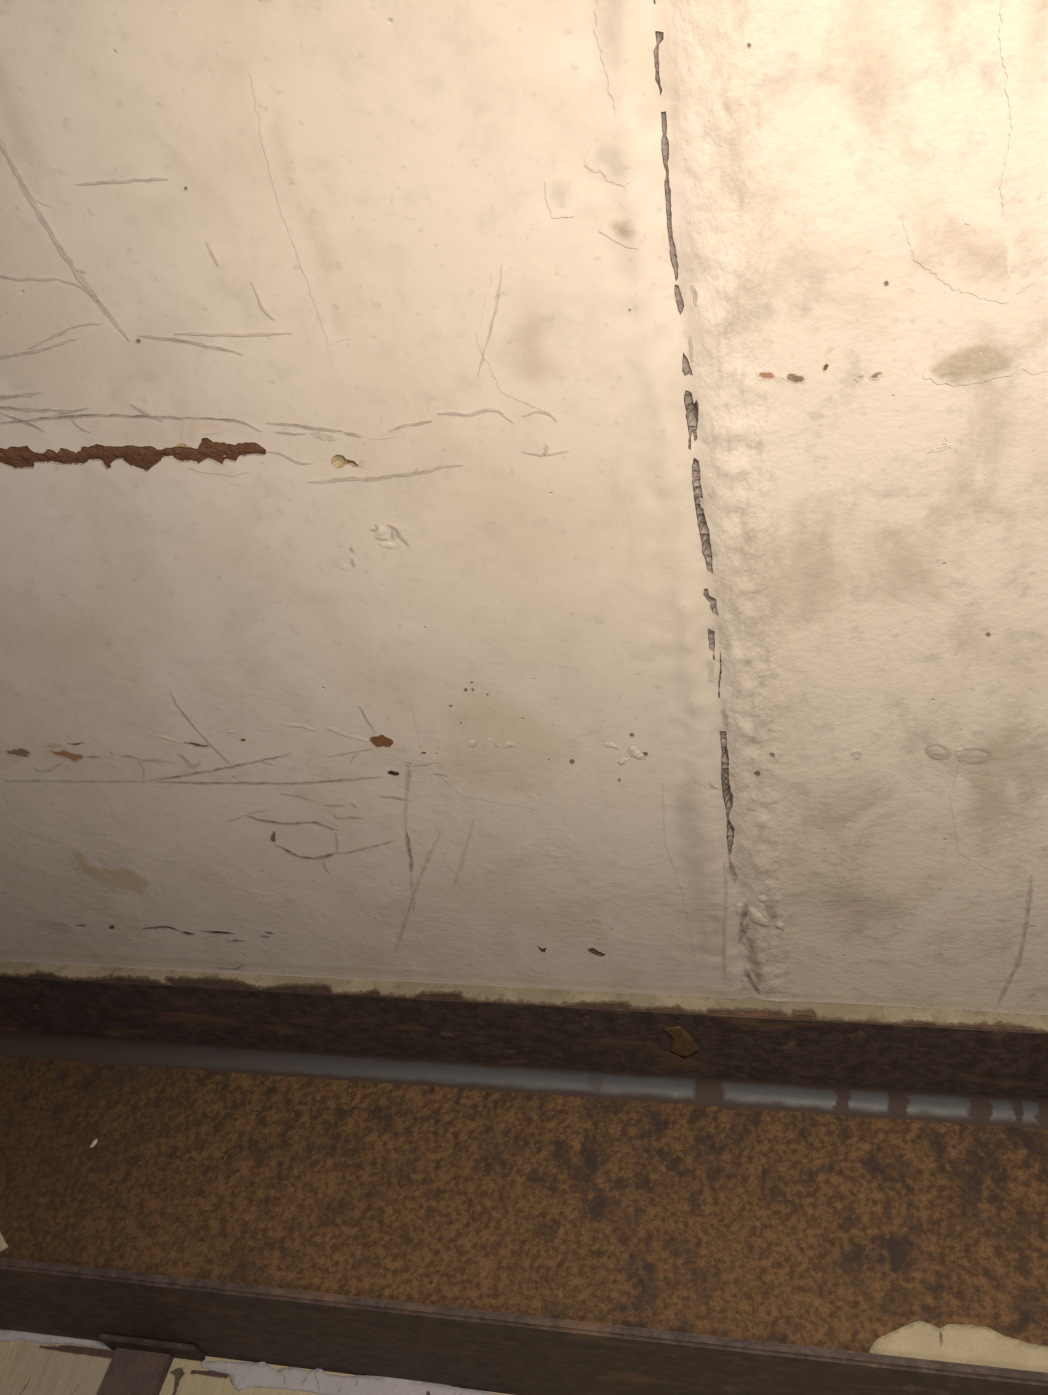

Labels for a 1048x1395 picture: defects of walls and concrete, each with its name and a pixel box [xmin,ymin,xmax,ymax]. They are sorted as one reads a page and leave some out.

crack [653,0,761,995]
damp [923,340,1048,386]